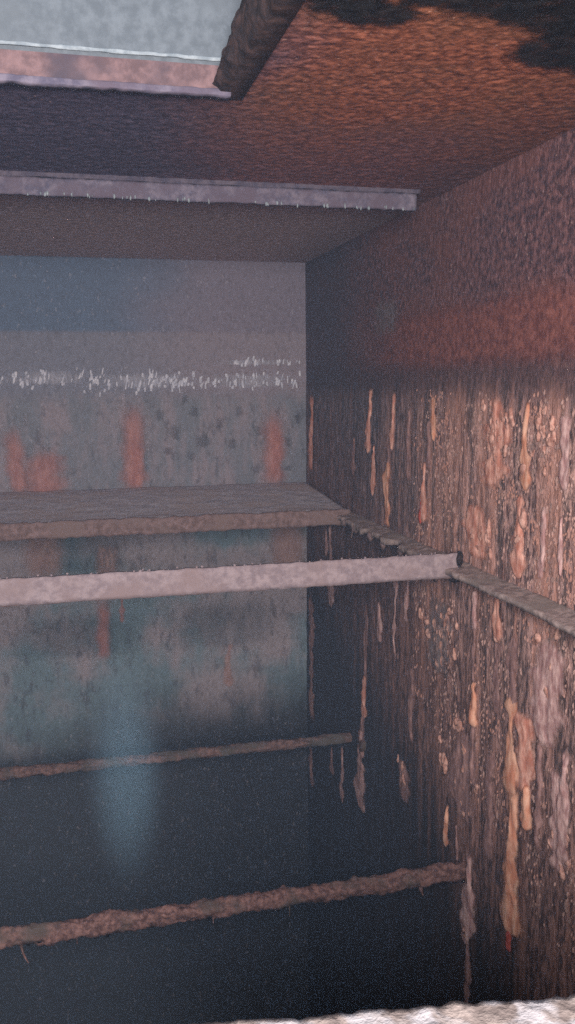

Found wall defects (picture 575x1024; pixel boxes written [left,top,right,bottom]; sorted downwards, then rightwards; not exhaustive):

damp [308,0,575,74]
corrosion [350,390,436,526]
corrosion [509,403,563,578]
corrosion [558,416,572,491]
corrosion [329,580,409,812]
corrosion [468,591,543,952]
corrosion [442,806,476,1003]